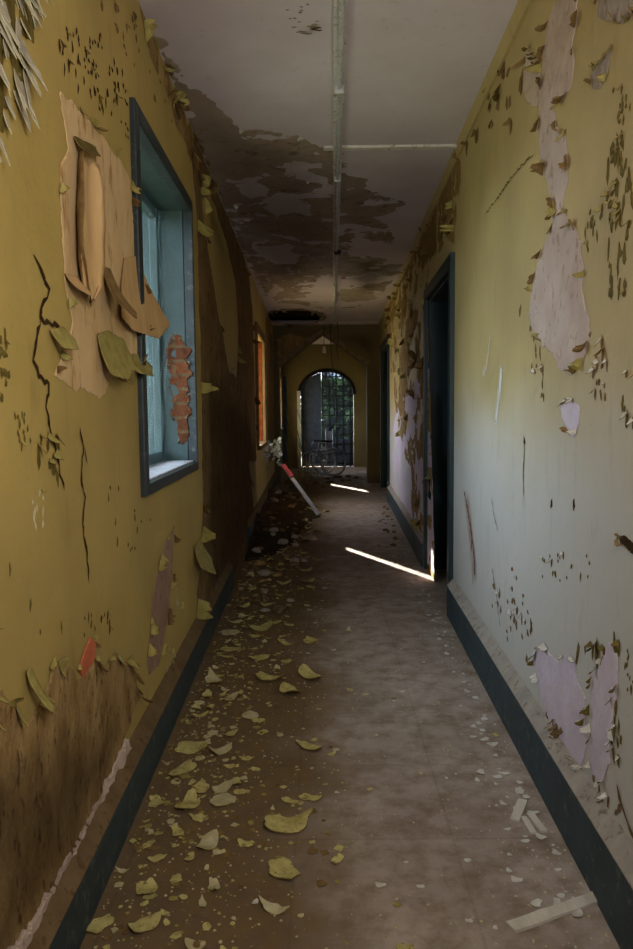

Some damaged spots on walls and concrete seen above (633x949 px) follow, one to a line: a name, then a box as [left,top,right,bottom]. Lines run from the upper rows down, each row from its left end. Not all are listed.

crack [33,255,89,580]
spalling [0,0,633,620]
spalling [0,525,181,949]
spalling [492,567,532,641]
peeling [525,631,633,808]